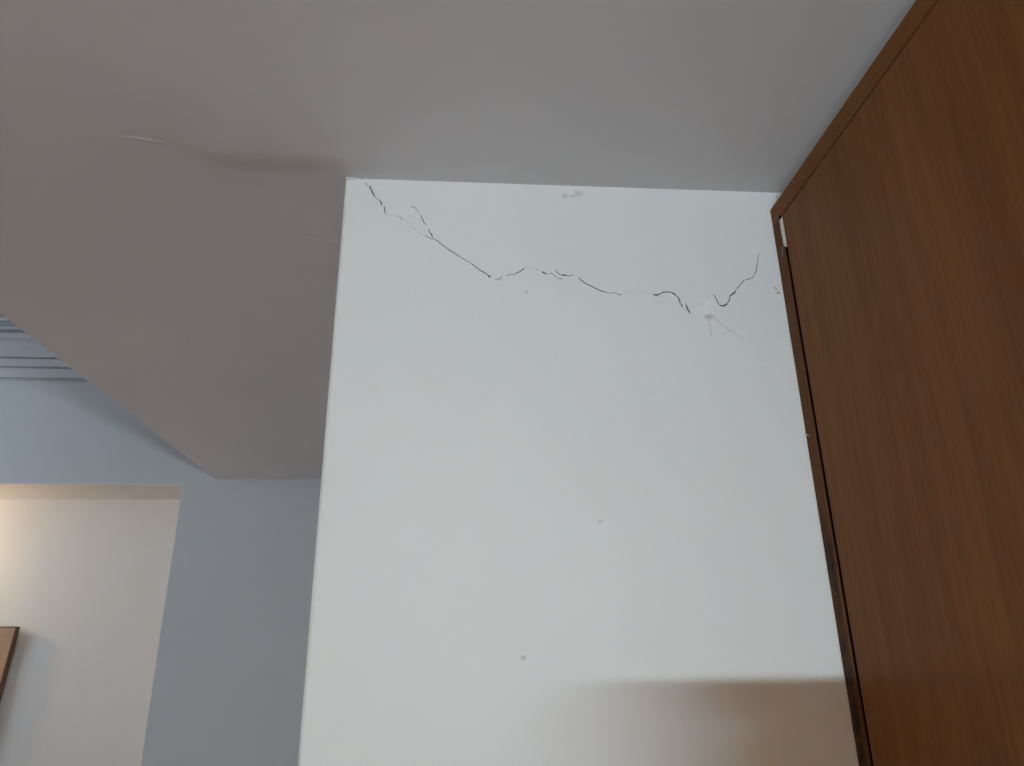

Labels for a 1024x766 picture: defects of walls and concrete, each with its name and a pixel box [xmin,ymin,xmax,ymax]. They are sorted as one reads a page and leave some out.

crack [366,183,691,313]
crack [713,254,780,307]